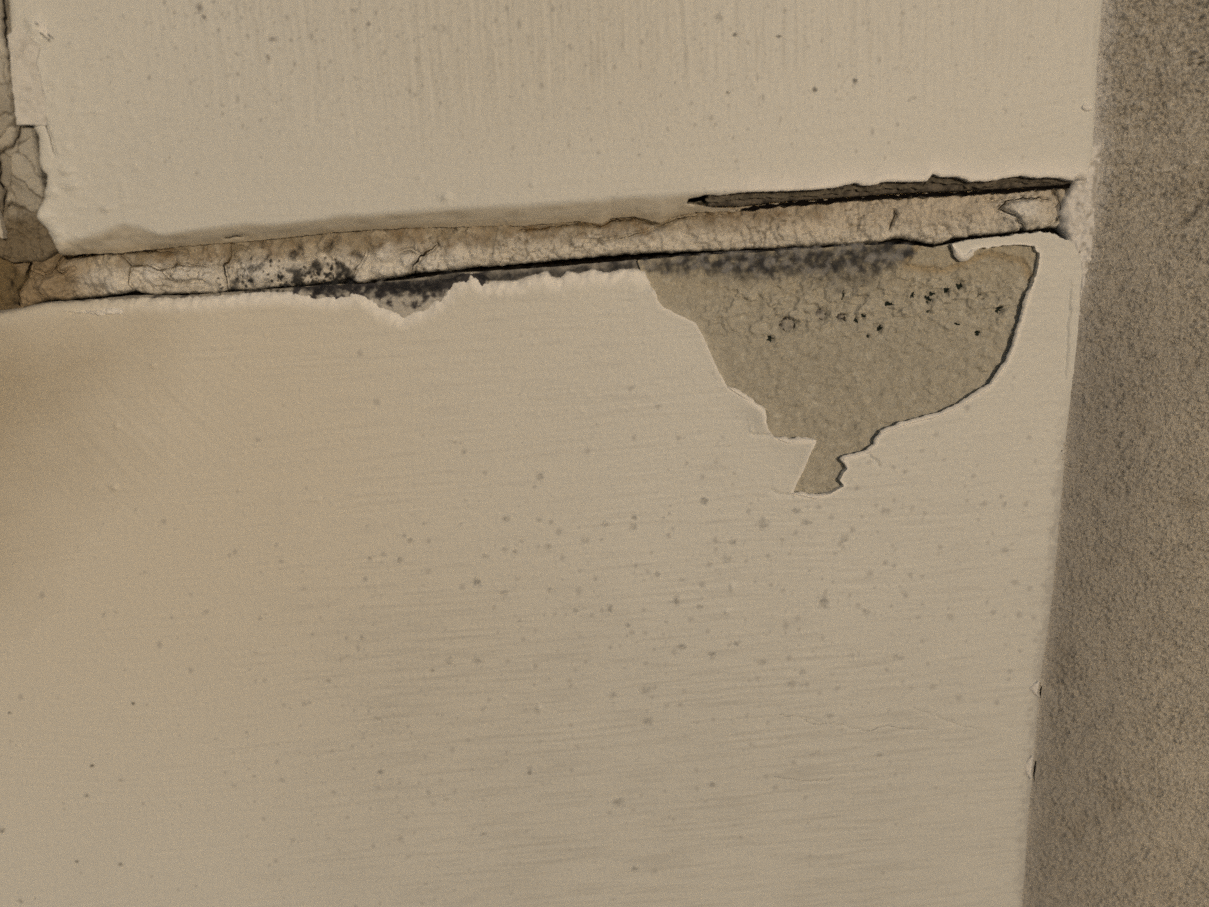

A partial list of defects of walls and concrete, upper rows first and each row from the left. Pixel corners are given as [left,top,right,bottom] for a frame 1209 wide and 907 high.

crack [0,0,55,210]
peeling [293,273,490,318]
crack [17,183,1071,306]
peeling [637,243,1037,499]